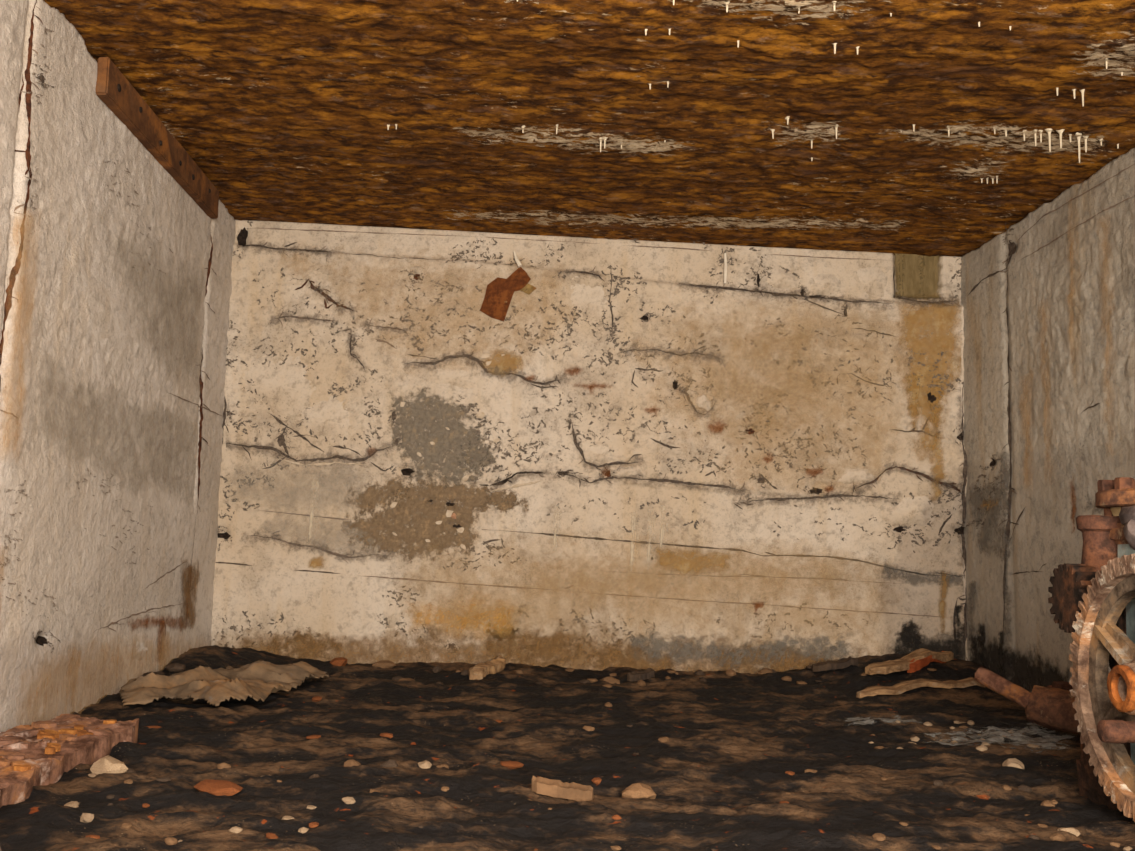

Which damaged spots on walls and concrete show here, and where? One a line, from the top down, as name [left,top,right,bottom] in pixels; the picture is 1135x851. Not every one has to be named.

crack [0,0,43,418]
efflorescence [451,122,692,156]
leakage [443,209,911,231]
efflorescence [879,120,1104,182]
crack [241,242,565,388]
spalling [217,238,1004,571]
crack [567,266,726,387]
crack [679,241,1045,630]
leakage [894,253,961,497]
crack [479,385,968,661]
corrosion [132,567,191,660]
leakage [241,602,847,674]